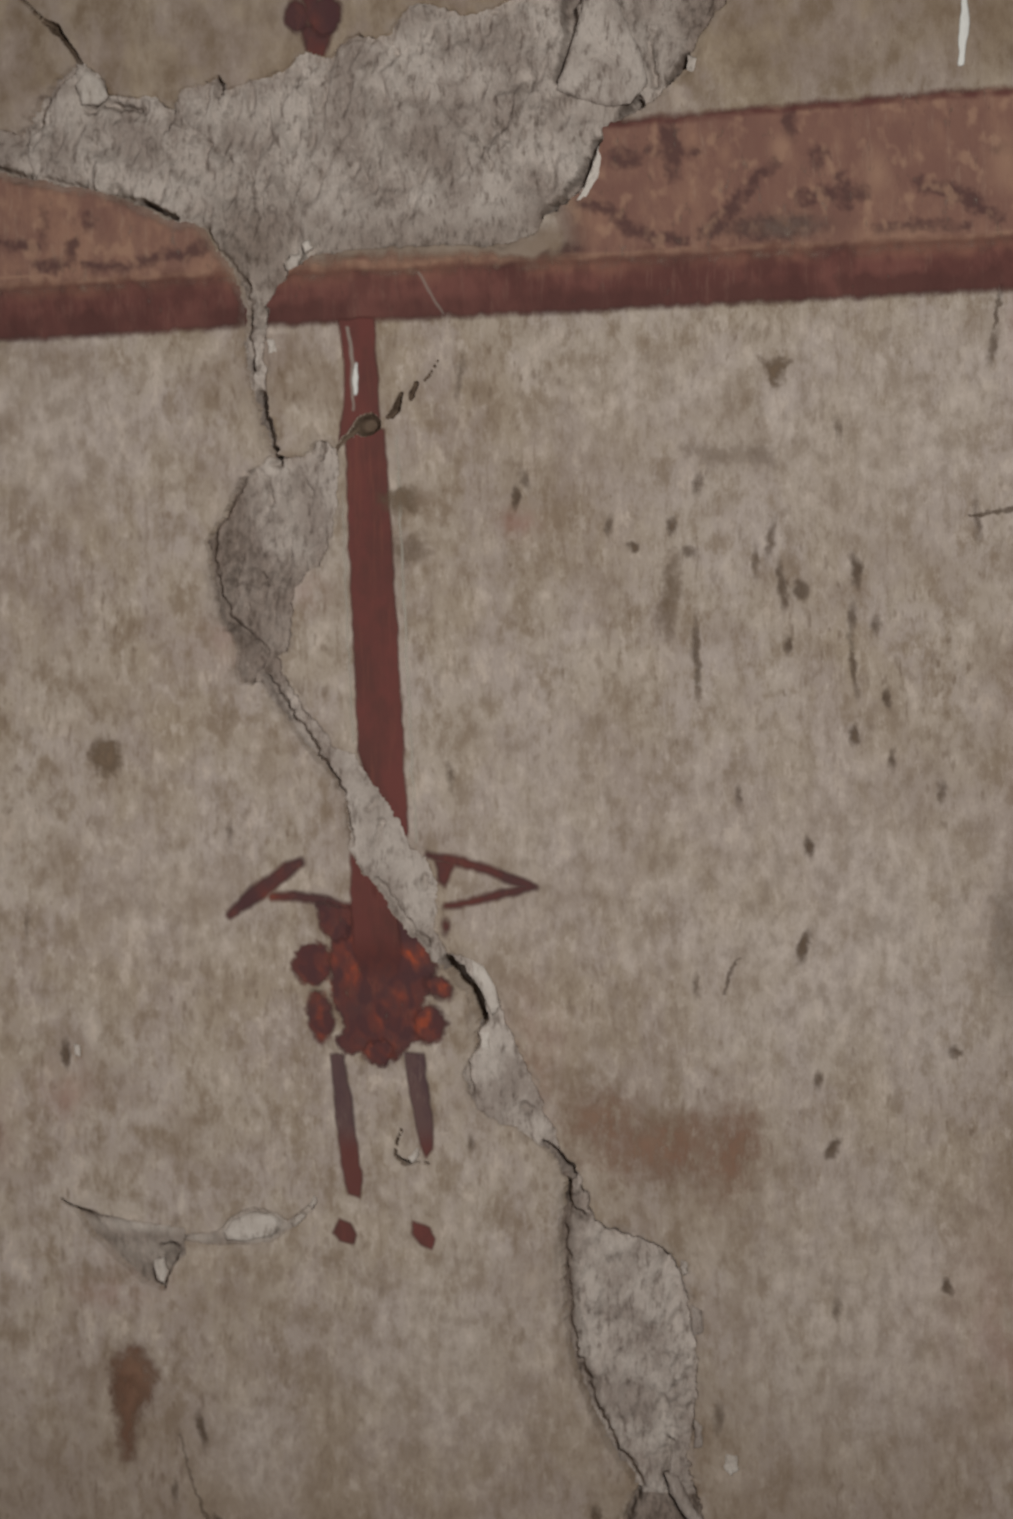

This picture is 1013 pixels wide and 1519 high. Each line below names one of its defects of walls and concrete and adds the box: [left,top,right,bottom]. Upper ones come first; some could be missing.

crack [20,0,84,65]
flaking render [0,0,726,684]
spalling [777,570,806,604]
spalling [852,561,862,580]
spalling [78,1195,317,1287]
spalling [561,1178,703,1519]